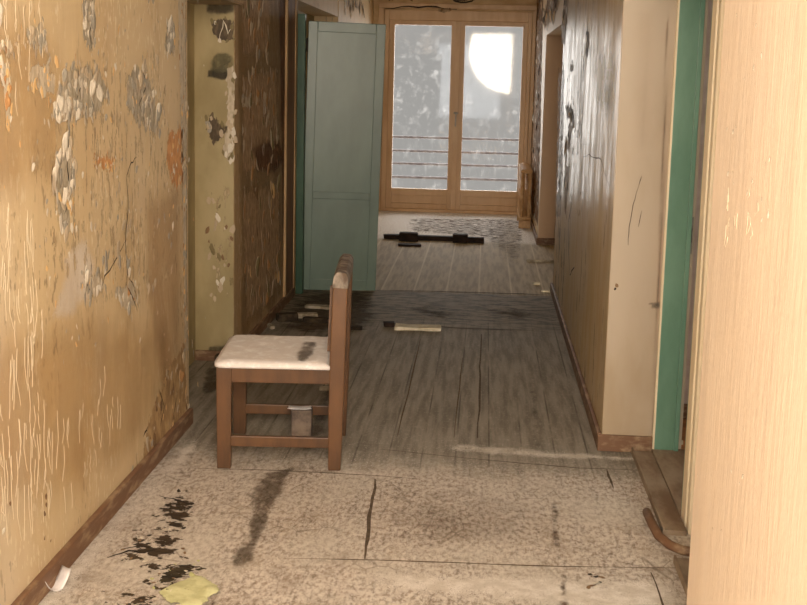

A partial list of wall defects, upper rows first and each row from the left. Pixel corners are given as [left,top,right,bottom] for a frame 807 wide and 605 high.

leakage [0,203,96,540]
peeling [0,0,194,457]
peeling [205,188,235,302]
peeling [531,0,569,226]